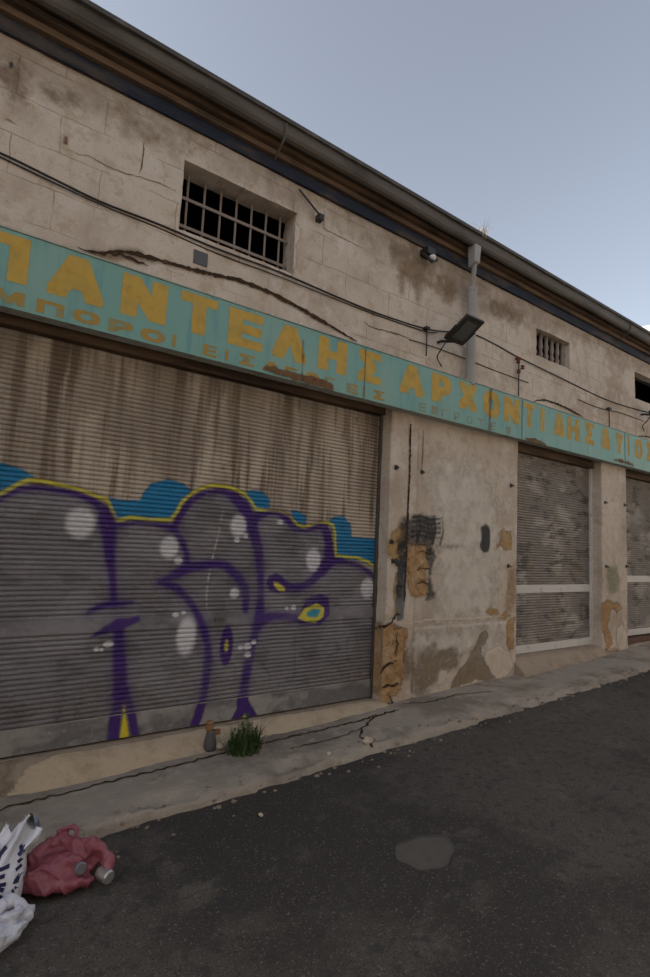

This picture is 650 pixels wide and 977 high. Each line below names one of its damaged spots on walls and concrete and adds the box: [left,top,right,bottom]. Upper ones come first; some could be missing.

crack [78,247,411,342]
flaking render [6,458,513,796]
leakage [404,631,494,695]
flaking render [601,600,627,653]